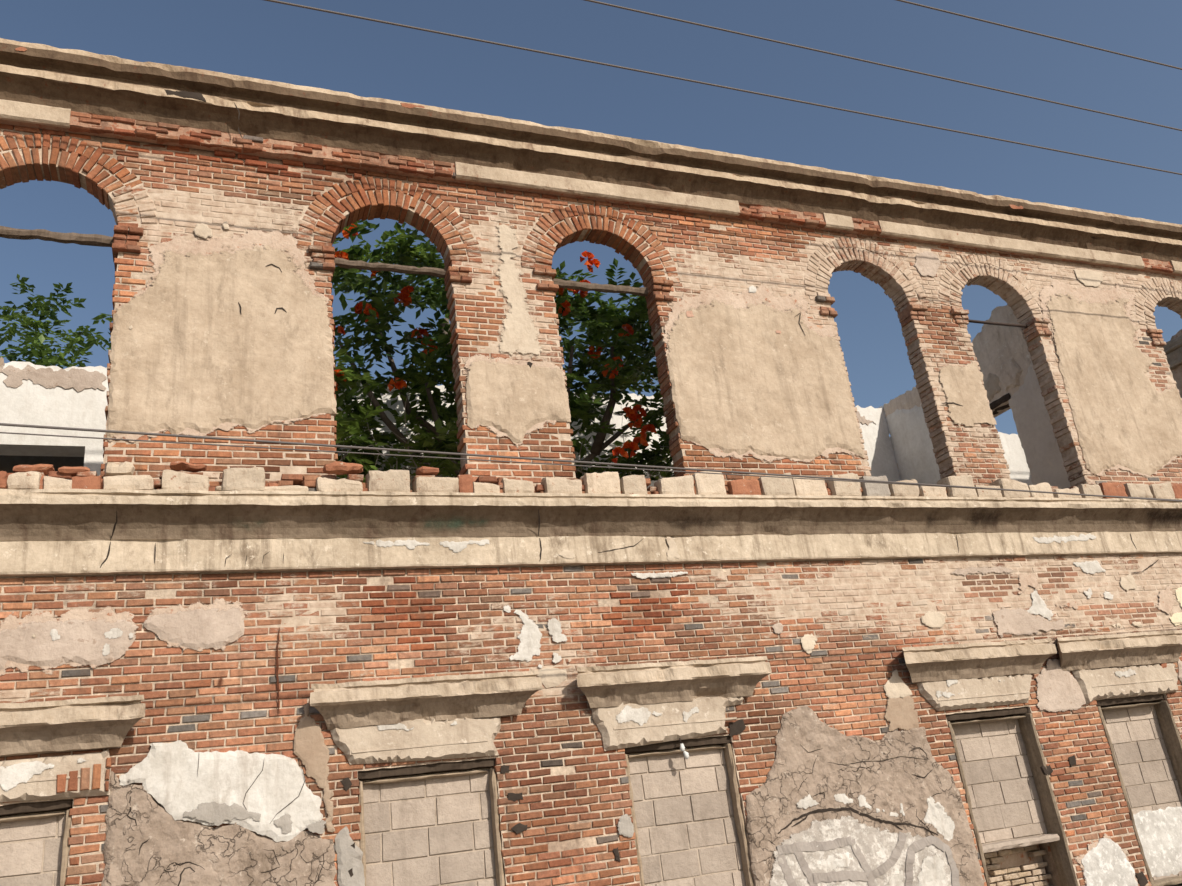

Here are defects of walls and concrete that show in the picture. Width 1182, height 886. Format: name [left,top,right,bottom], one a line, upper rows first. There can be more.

crack [100,511,117,568]
peeling [0,598,248,676]
peeling [504,605,571,668]
peeling [951,560,1182,638]
spalling [65,805,106,886]
peeling [0,740,364,842]
crack [778,807,938,835]
spalling [1034,713,1182,886]